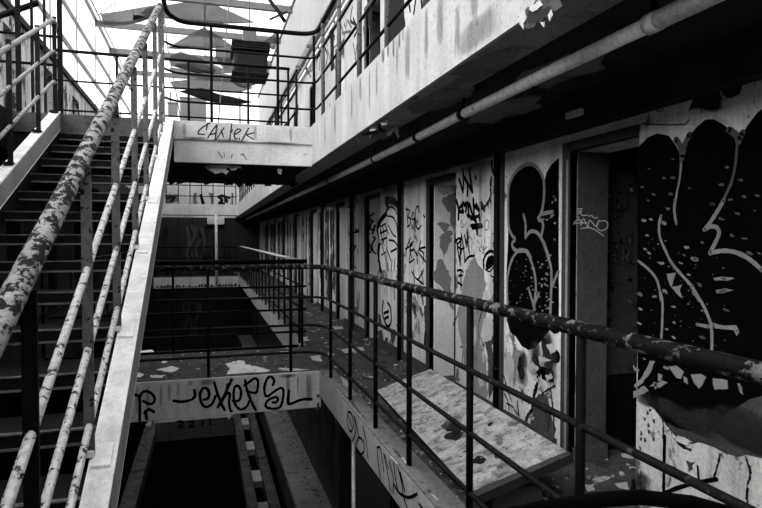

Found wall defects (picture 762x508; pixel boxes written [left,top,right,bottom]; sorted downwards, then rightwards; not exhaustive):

spalling [517,0,563,29]
peeling [688,86,742,112]
peeling [652,246,702,304]
peeling [712,267,734,294]
peeling [505,344,522,387]
peeling [528,342,556,438]
peeling [633,358,728,398]